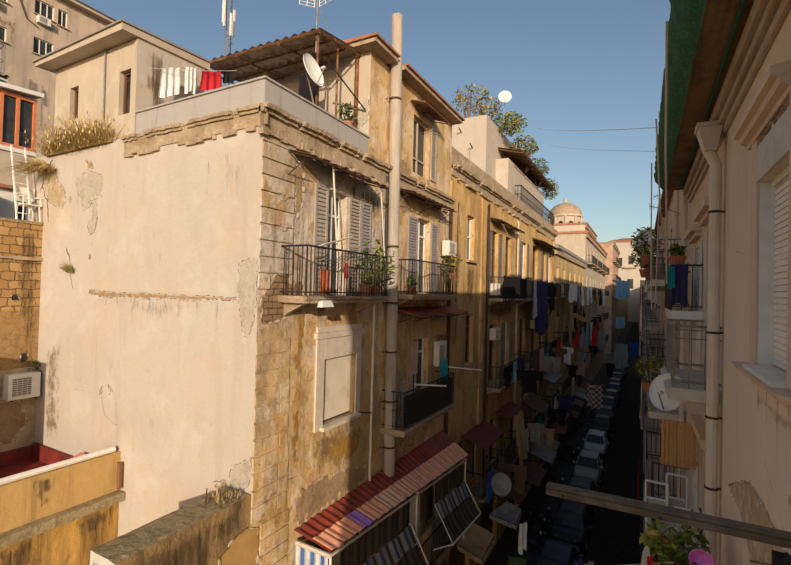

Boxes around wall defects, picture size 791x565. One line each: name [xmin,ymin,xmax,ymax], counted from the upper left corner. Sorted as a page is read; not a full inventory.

spalling [43,159,103,235]
spalling [87,257,305,338]
spalling [0,401,27,445]
spalling [213,457,252,491]
spalling [728,480,776,529]
spalling [746,539,786,565]